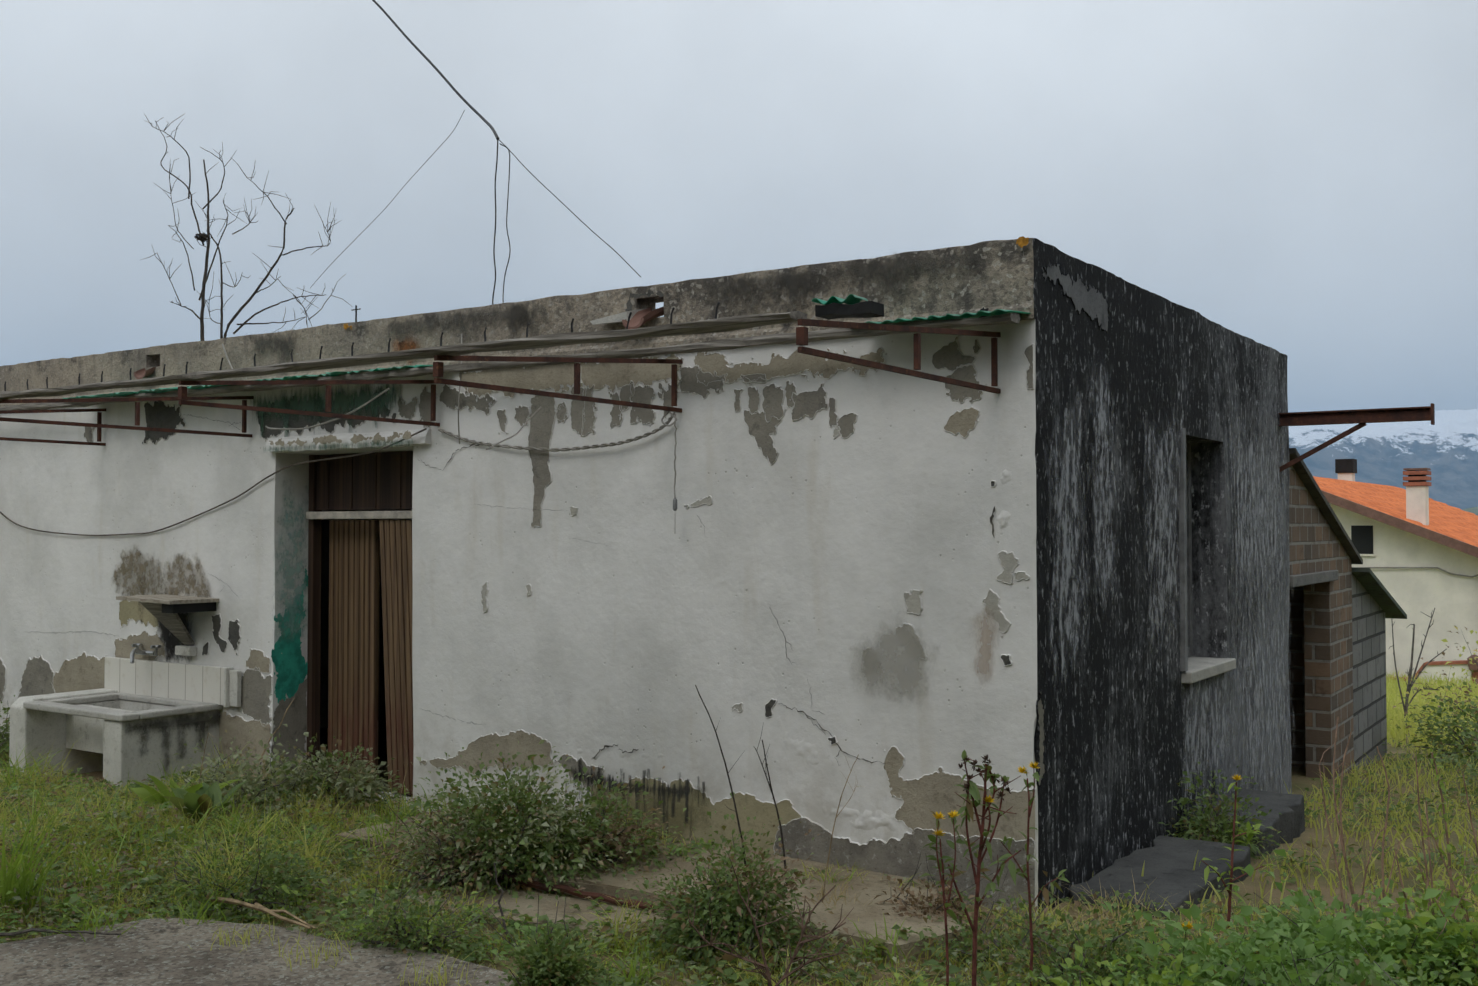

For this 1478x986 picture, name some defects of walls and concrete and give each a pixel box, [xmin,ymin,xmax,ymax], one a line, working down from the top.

peeling [256,347,886,528]
peeling [932,336,984,439]
peeling [0,600,166,702]
crack [769,604,885,765]
peeling [896,589,927,661]
peeling [982,550,1030,633]
flaking render [1000,654,1013,667]
spalling [419,689,1045,915]